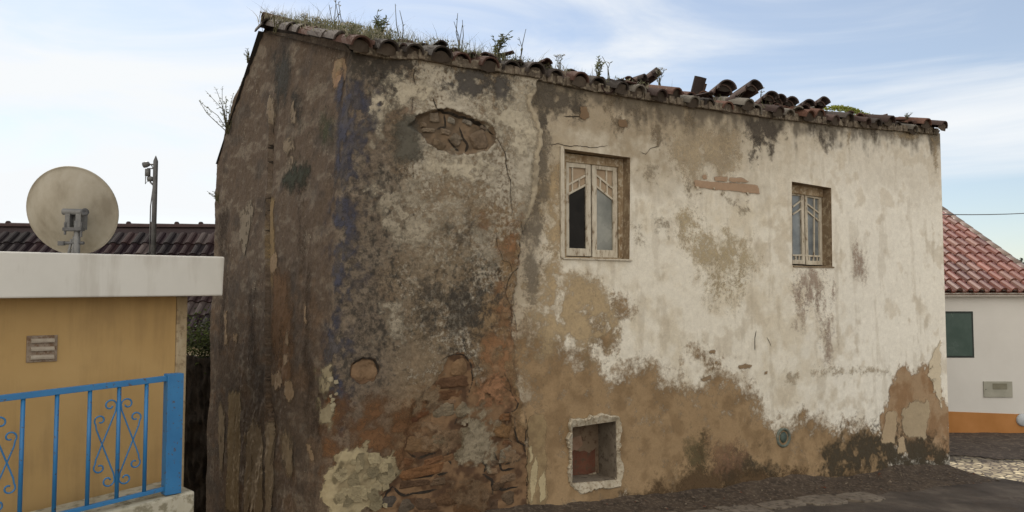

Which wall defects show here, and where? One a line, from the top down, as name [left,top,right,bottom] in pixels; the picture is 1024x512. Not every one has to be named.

water stain [303,67,409,479]
spalling [414,108,496,155]
water stain [441,69,515,102]
crack [495,137,523,331]
peeling [694,175,760,196]
water stain [505,82,950,505]
spalling [319,352,548,512]
peeling [881,340,942,454]